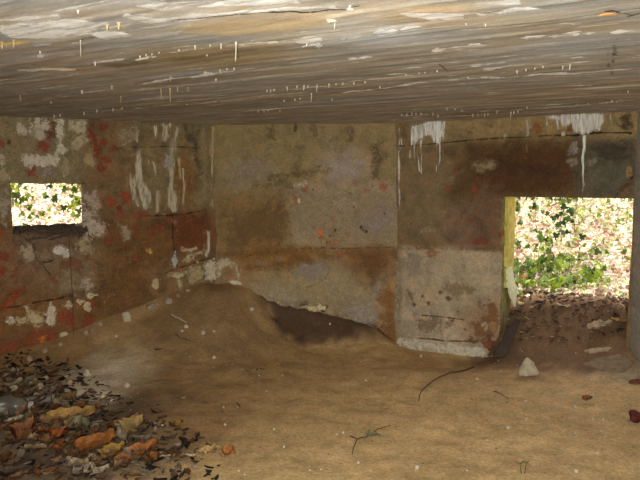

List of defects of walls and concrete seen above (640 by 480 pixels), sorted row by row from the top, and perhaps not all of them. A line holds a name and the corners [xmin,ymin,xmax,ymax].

damp [400,110,500,174]
crack [399,132,632,146]
damp [470,101,628,196]
damp [129,123,383,285]